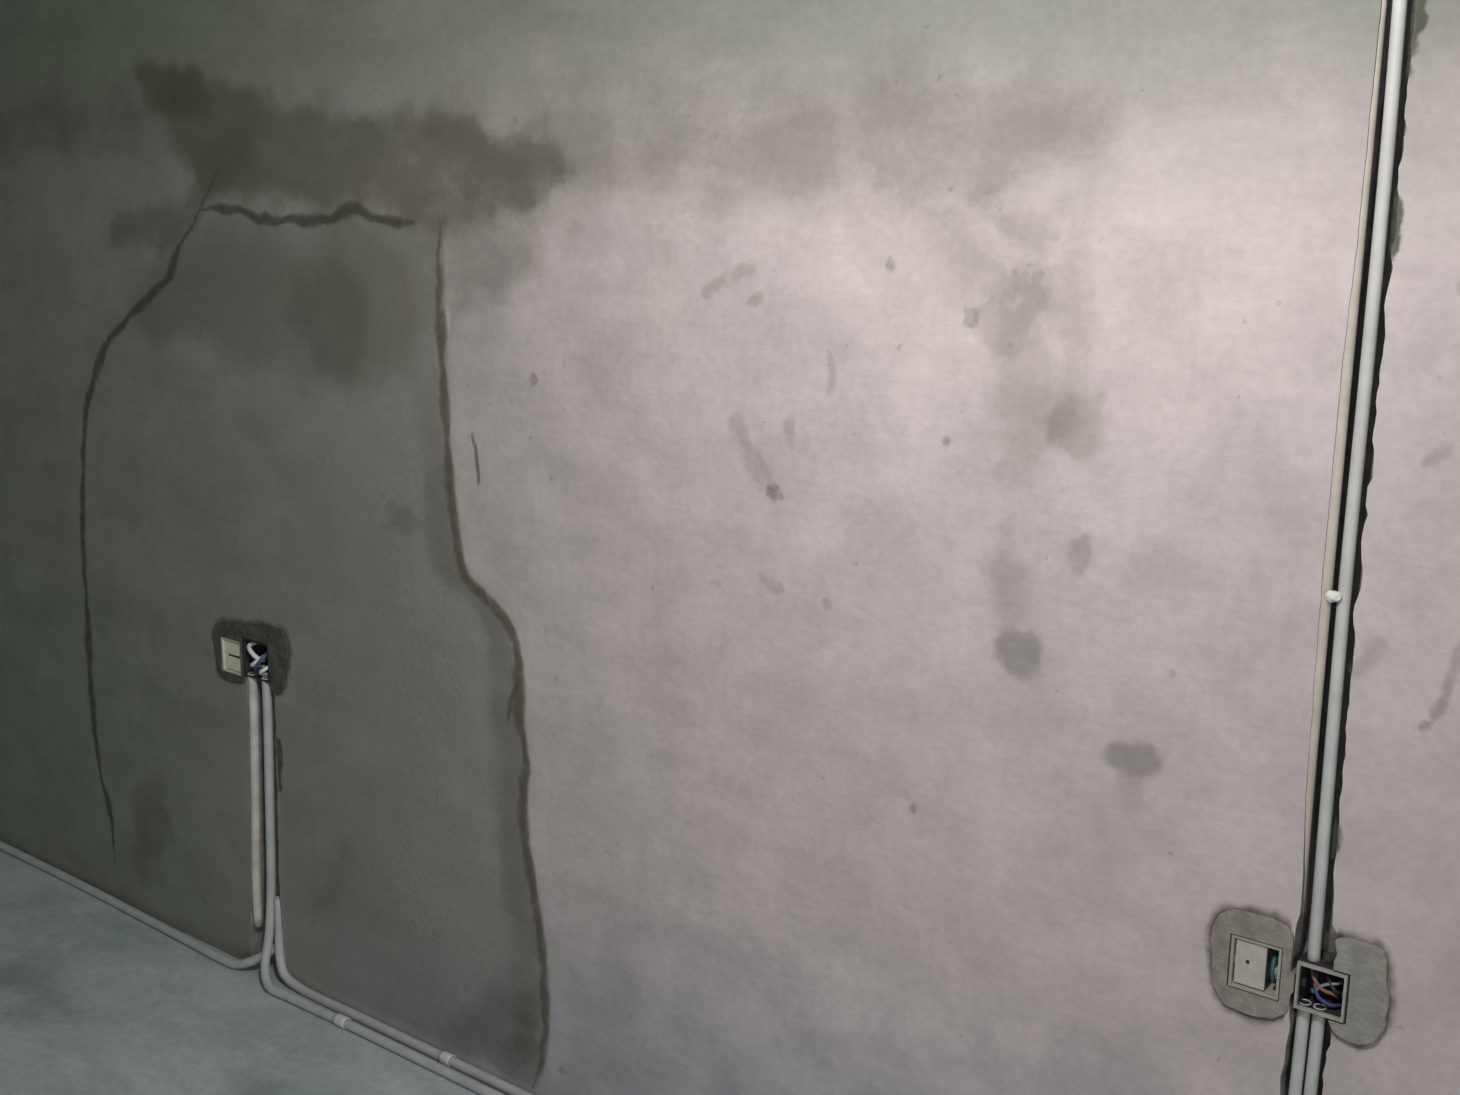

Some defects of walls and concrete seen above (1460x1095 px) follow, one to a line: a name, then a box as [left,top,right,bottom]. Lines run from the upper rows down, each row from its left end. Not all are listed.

crack [80,173,402,842]
crack [436,224,569,1095]